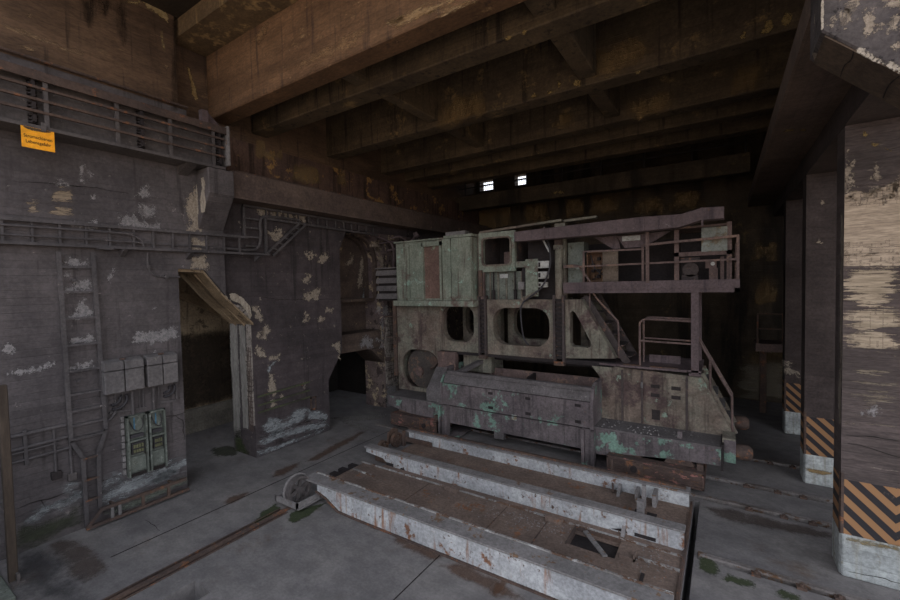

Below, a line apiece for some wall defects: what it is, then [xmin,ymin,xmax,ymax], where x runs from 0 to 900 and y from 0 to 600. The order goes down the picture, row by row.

peeling [821,0,900,51]
spalling [856,47,900,73]
peeling [117,202,161,232]
peeling [183,177,209,271]
peeling [843,149,900,353]
peeling [131,325,179,353]
peeling [226,293,280,437]
peeling [268,373,284,407]
efflorescence [257,408,329,455]
rust [396,538,440,559]
rust [448,565,515,596]